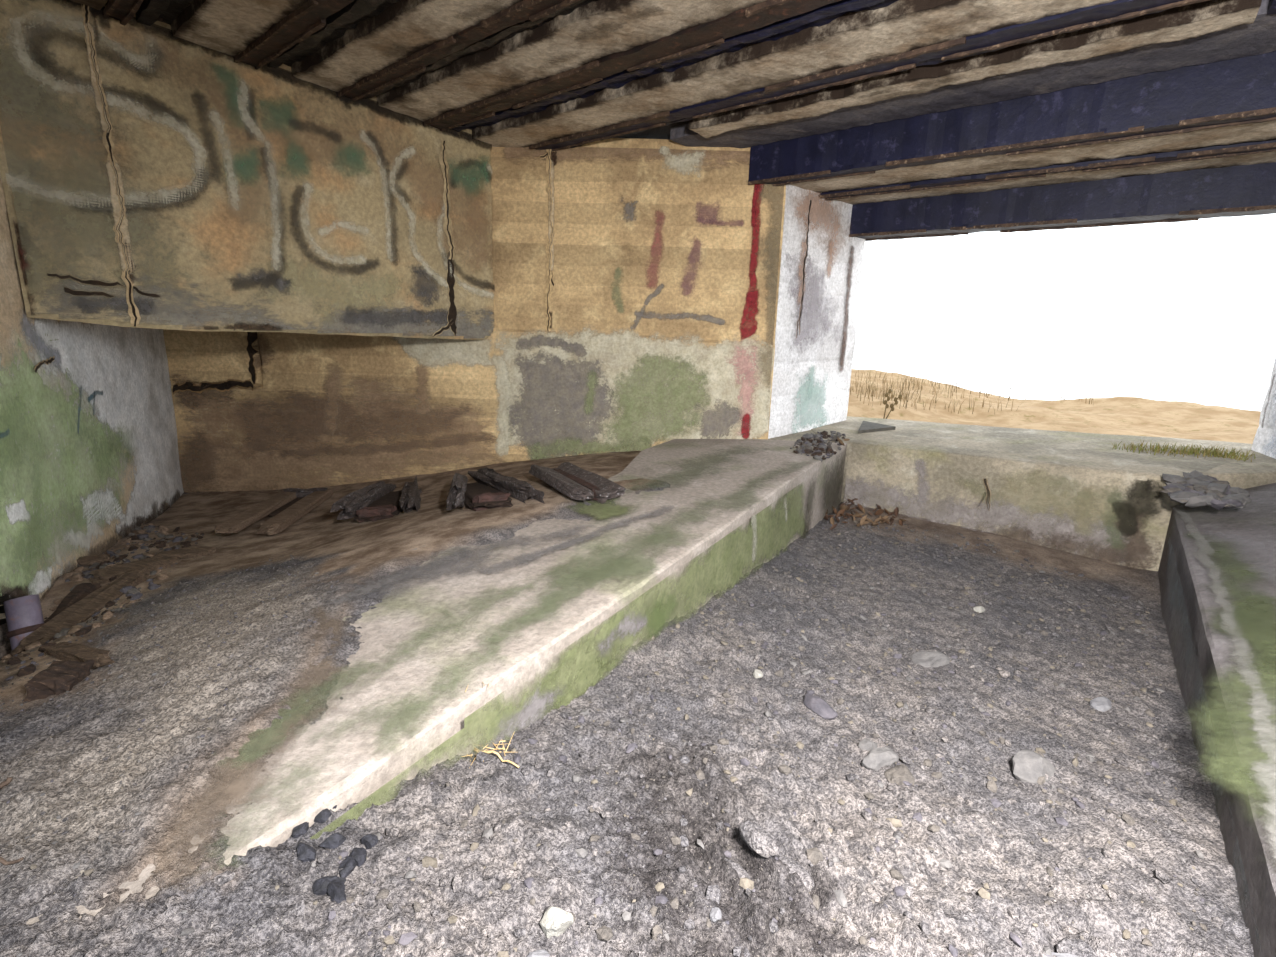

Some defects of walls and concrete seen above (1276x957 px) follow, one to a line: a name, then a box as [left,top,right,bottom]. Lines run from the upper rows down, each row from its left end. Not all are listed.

crack [172,332,258,395]
water stain [0,37,506,588]
water stain [506,335,651,460]